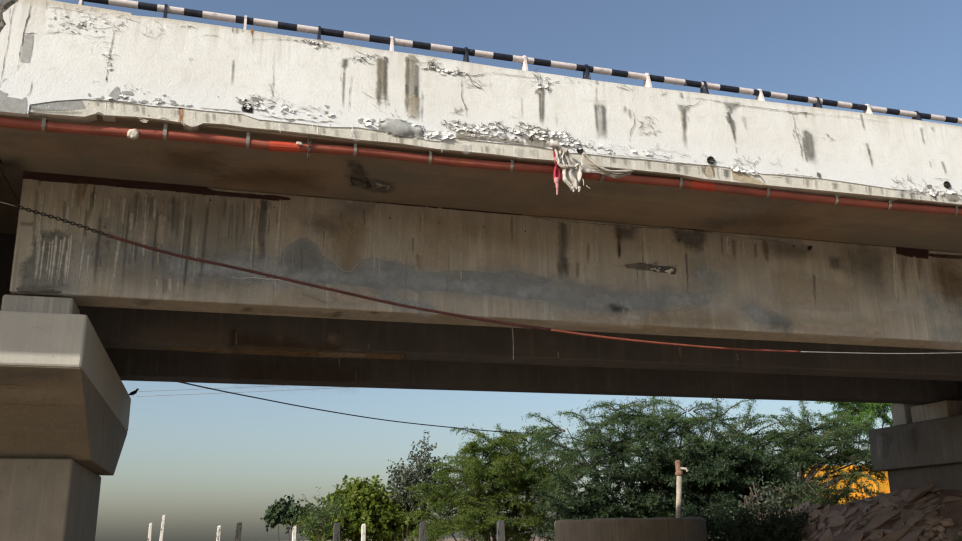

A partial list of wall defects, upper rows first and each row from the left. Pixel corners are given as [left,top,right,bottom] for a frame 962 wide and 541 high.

spalling [0,0,18,32]
water stain [363,55,427,122]
water stain [493,68,552,119]
peeling [441,117,821,183]
water stain [726,103,739,140]
water stain [792,114,813,160]
peeling [890,176,962,203]
water stain [24,189,722,330]
spalling [610,261,677,280]